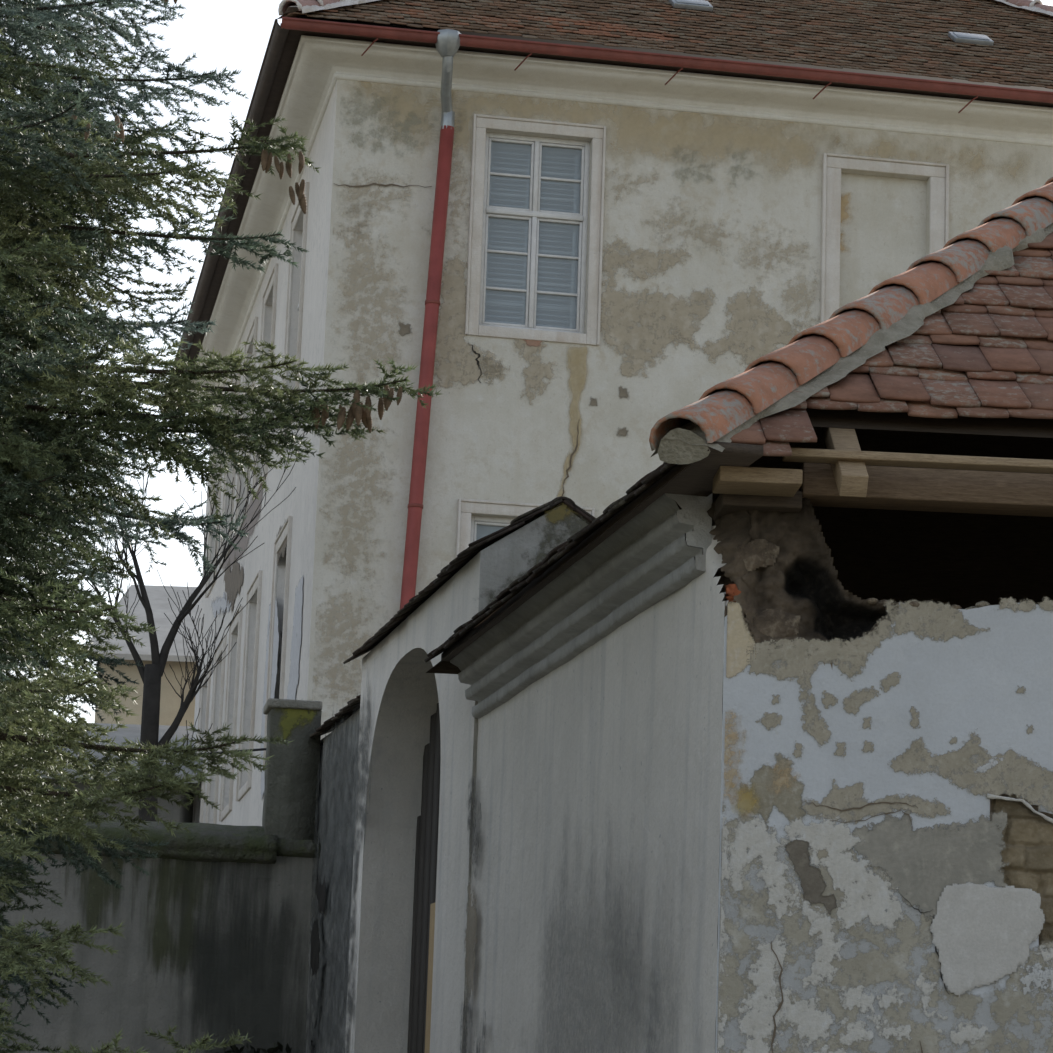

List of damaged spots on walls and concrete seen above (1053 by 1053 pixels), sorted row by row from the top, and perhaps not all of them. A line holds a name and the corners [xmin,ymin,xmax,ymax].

crack [333,181,432,189]
flaking render [600,214,816,398]
crack [562,419,580,496]
damp [176,694,372,1053]
damp [460,778,486,1053]
crack [771,941,783,1053]
peeling [717,597,1053,1053]